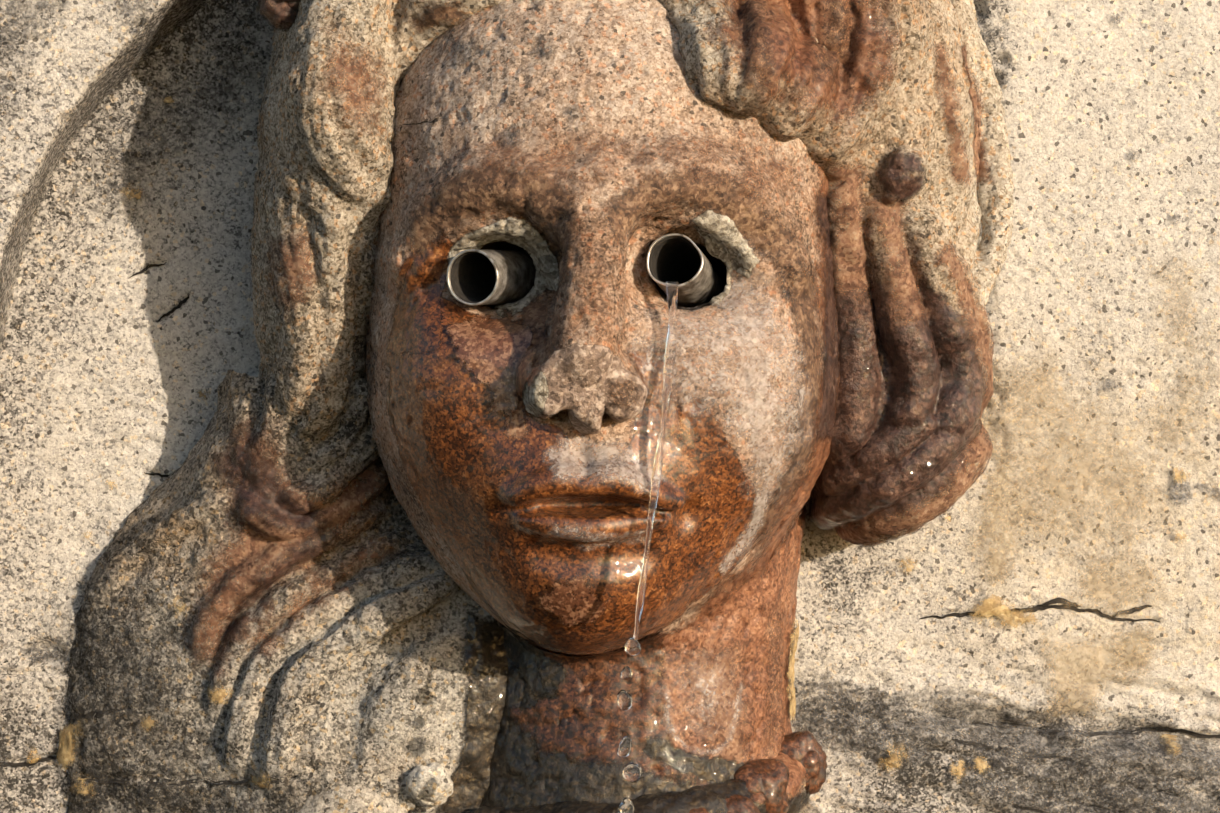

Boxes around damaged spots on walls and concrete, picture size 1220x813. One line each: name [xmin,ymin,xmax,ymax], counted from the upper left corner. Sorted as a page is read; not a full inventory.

damp [982,370,1144,530]
damp [1088,567,1151,608]
crack [920,597,1161,623]